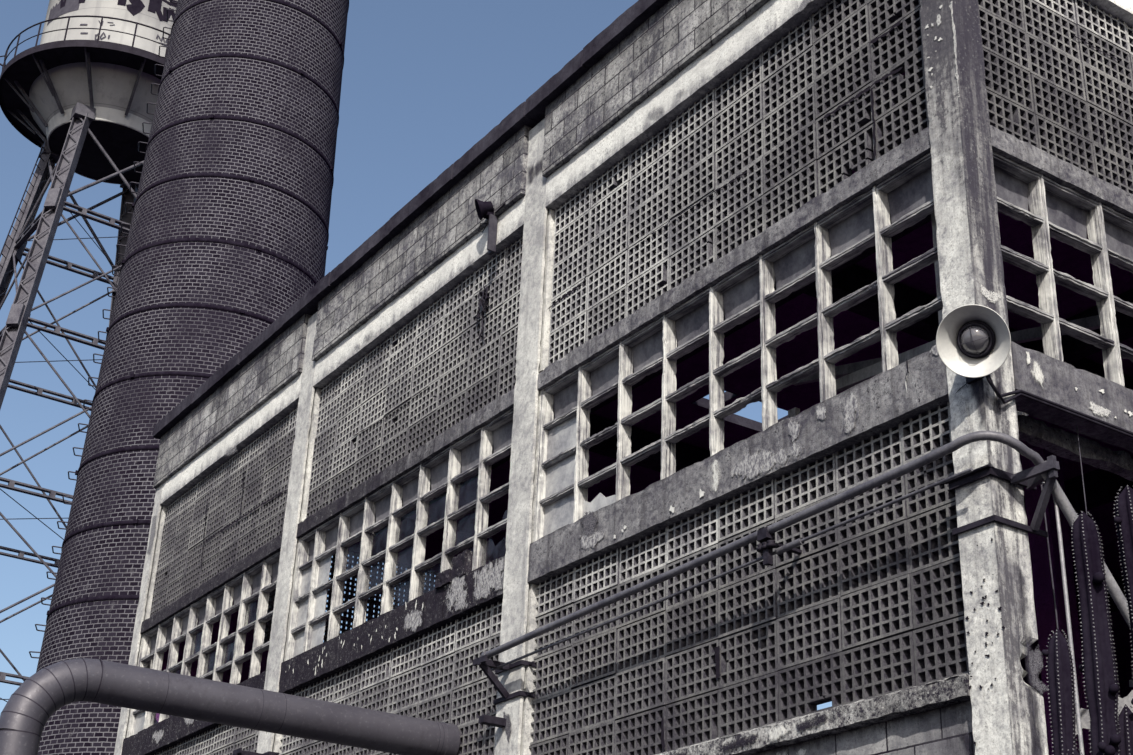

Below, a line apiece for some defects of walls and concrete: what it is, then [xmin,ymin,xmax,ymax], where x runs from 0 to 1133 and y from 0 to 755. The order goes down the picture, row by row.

peeling [435,550,505,616]
peeling [339,600,424,649]